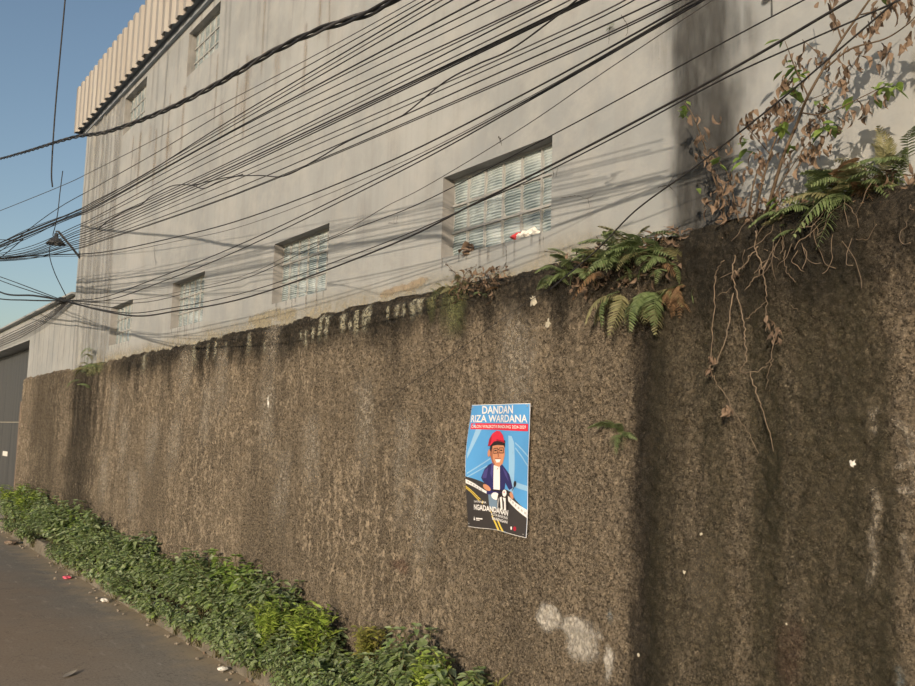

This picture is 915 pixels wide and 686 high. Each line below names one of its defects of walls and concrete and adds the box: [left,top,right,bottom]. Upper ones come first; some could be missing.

damp [676,0,728,236]
damp [63,253,635,518]
damp [395,420,436,553]
damp [631,316,662,686]